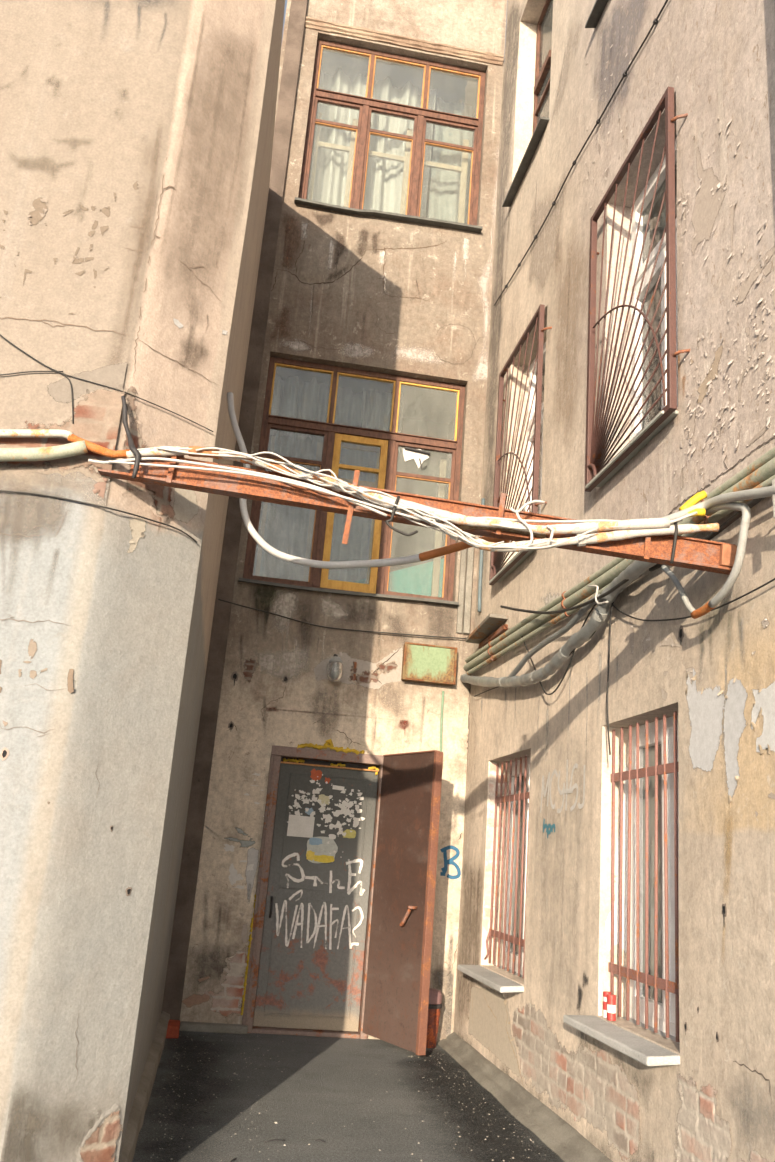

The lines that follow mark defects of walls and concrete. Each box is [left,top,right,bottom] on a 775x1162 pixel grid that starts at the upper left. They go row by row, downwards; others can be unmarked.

peeling [26,197,48,226]
peeling [63,193,117,288]
water stain [284,214,386,281]
peeling [674,220,775,497]
flaking render [0,384,175,523]
peeling [18,639,47,679]
flaking render [313,647,403,689]
peeling [685,667,775,803]
flaking render [207,913,248,1022]
flaking render [75,1103,124,1162]
flaking render [468,986,641,1162]
flaking render [674,1073,732,1162]